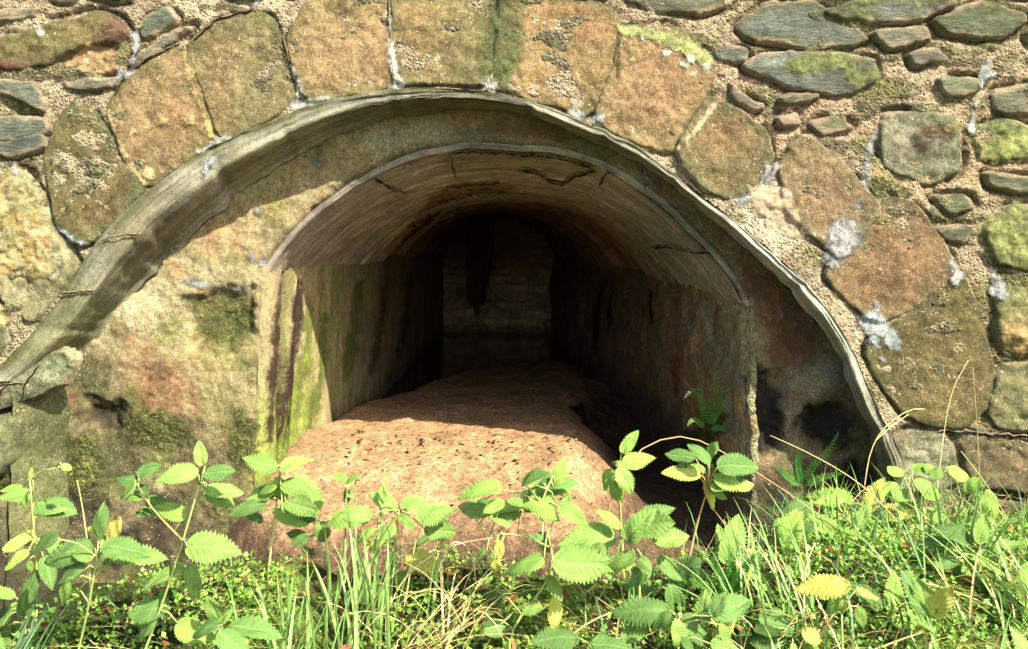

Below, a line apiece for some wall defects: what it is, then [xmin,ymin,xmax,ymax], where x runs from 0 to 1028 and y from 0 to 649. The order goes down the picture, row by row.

crack [107,0,254,185]
crack [373,178,408,195]
crack [402,149,614,244]
leakage [823,126,878,268]
crack [99,233,144,242]
crack [650,199,742,301]
leakage [989,269,1008,300]
leakage [857,301,902,361]
crack [0,365,40,414]